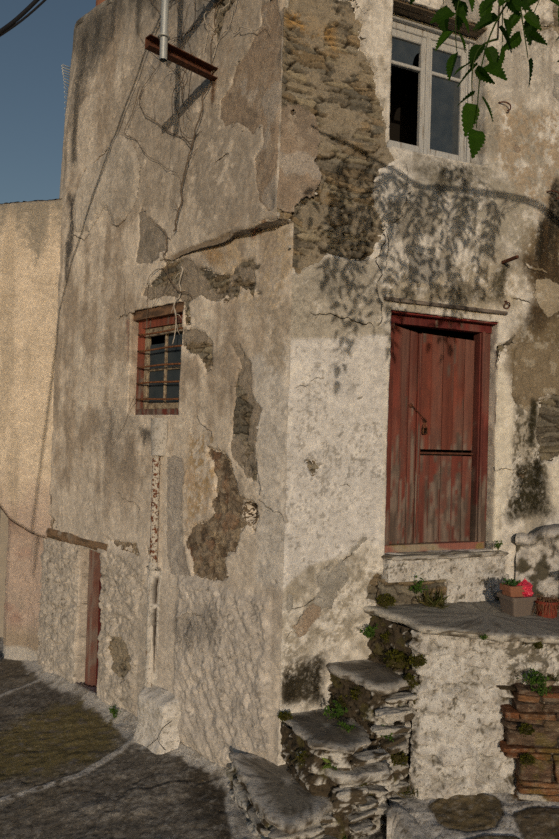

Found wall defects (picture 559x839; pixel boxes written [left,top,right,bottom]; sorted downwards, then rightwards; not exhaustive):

spalling [536,5,559,35]
spalling [214,0,396,274]
flaking render [136,205,168,264]
crack [309,163,412,328]
water stain [524,179,559,284]
spalling [143,258,262,376]
water stain [526,306,546,329]
spalling [186,344,262,581]
flaking render [496,333,559,462]
water stain [529,400,537,446]
spalling [105,637,131,681]
flaking render [291,603,327,637]